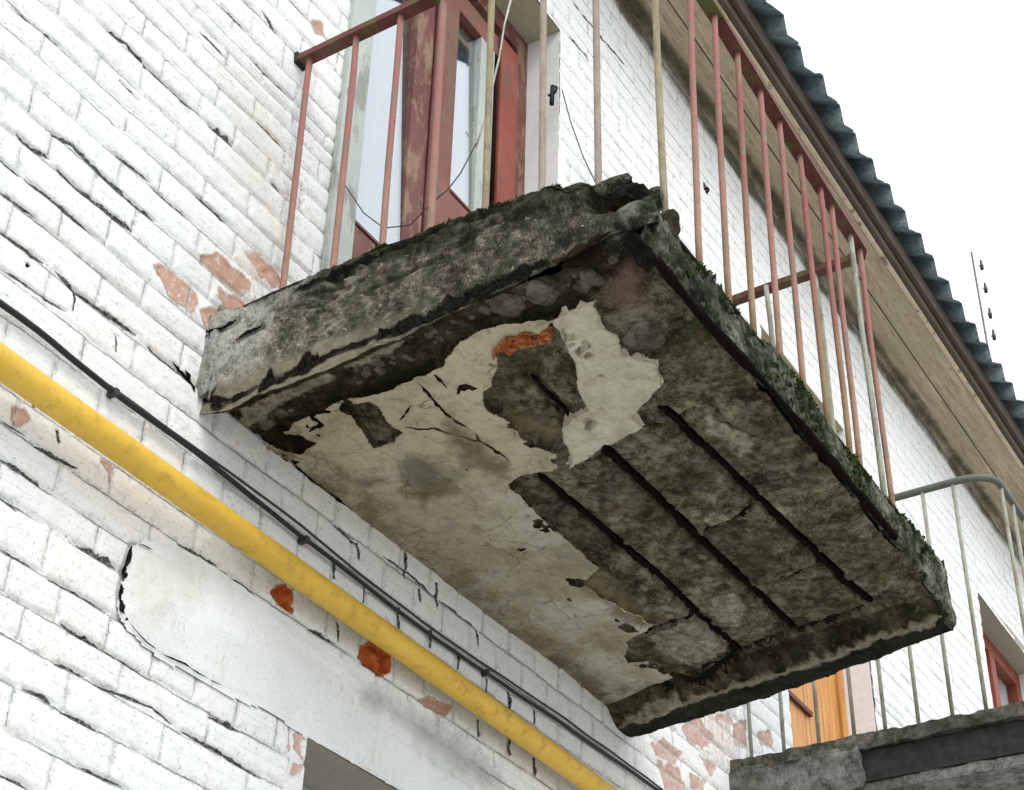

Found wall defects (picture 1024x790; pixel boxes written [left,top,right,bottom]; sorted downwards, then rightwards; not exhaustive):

peeling [154,251,280,328]
leakage [616,0,1023,562]
rust [492,326,554,360]
peeling [11,406,30,426]
crack [399,375,509,461]
spalling [229,231,935,677]
crack [118,543,221,685]
leakage [682,615,942,706]
spalling [418,696,452,716]
peeling [651,719,716,790]
peeling [717,714,773,748]